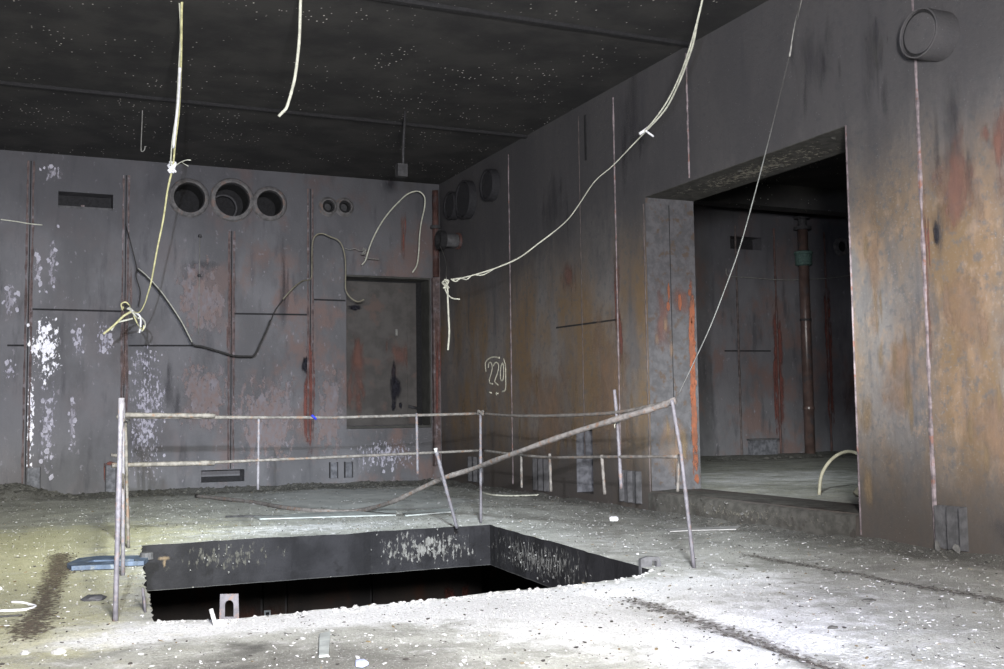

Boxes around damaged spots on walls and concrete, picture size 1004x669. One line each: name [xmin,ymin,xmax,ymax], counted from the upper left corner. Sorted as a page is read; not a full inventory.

peeling [71,318,85,355]
peeling [95,322,114,354]
peeling [26,317,62,480]
peeling [68,396,77,452]
peeling [129,346,166,480]
rust [667,424,686,462]
rust [773,314,784,432]